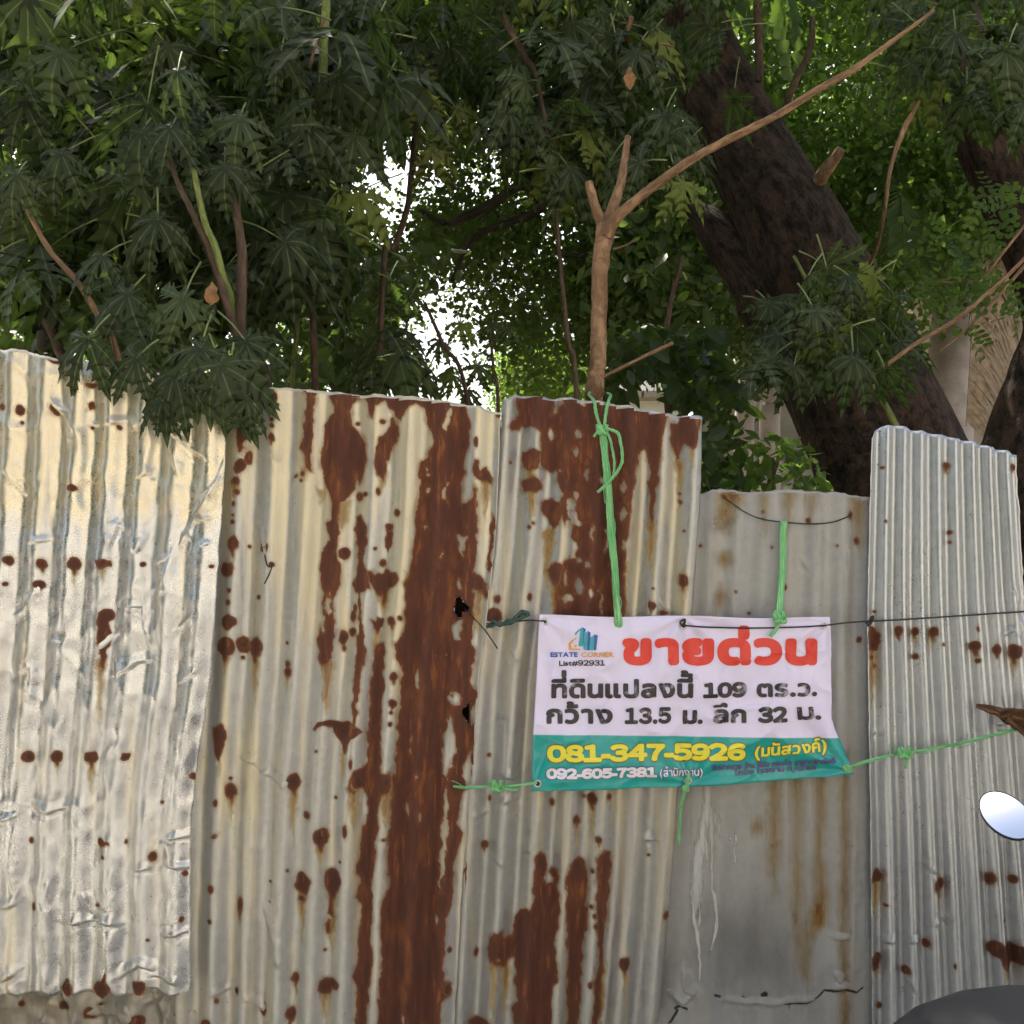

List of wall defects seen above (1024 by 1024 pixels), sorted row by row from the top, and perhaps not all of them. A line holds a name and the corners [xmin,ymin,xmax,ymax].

rust [496,396,701,617]
rust [32,558,48,591]
rust [66,557,82,581]
rust [209,428,275,686]
rust [96,609,115,710]
rust [968,626,1023,670]
rust [294,391,502,1024]
rust [84,751,99,778]
rust [286,773,310,823]
rust [285,869,311,927]
rust [468,836,612,1024]
rust [986,940,1024,985]